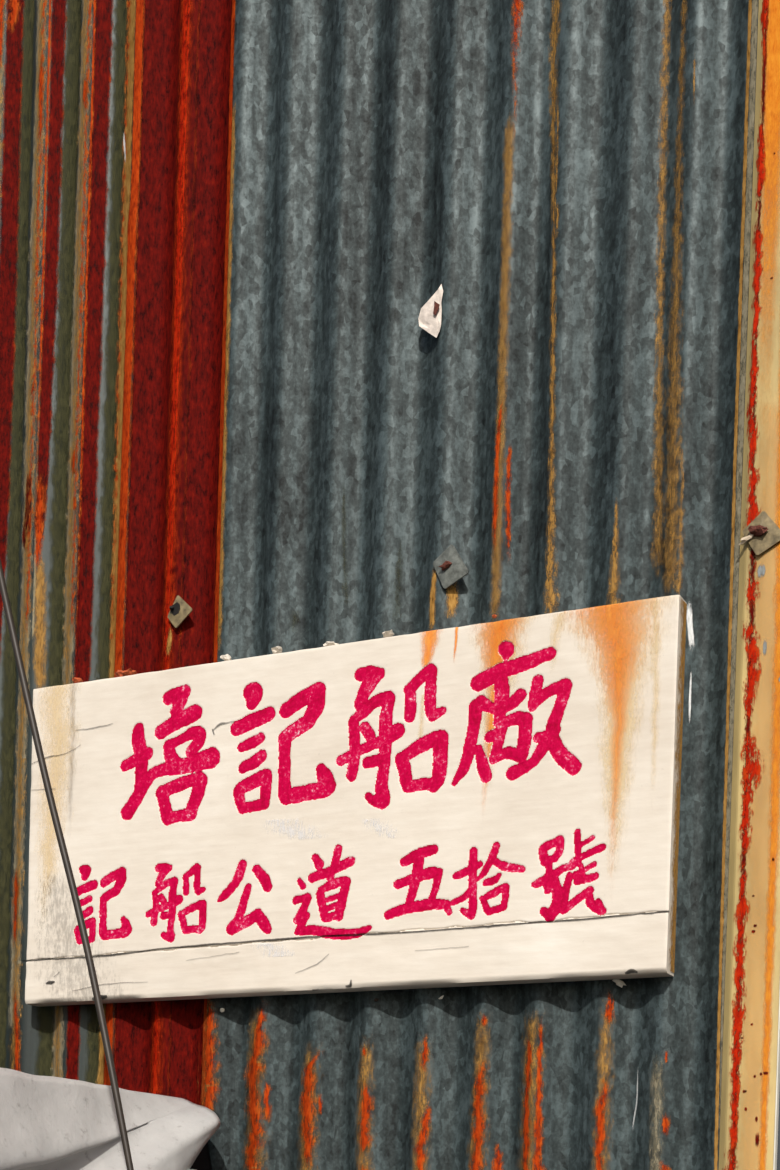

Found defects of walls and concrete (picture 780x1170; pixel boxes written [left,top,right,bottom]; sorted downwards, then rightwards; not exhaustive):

rust [0,0,67,687]
rust [64,0,236,685]
rust [714,0,780,1170]
rust [10,688,26,1072]
rust [53,1005,80,1080]
rust [97,999,220,1110]
rust [245,1009,270,1170]
rust [299,1053,322,1170]
rust [413,1036,431,1170]
rust [470,1016,503,1170]
rust [521,1022,547,1170]
rust [595,992,614,1170]